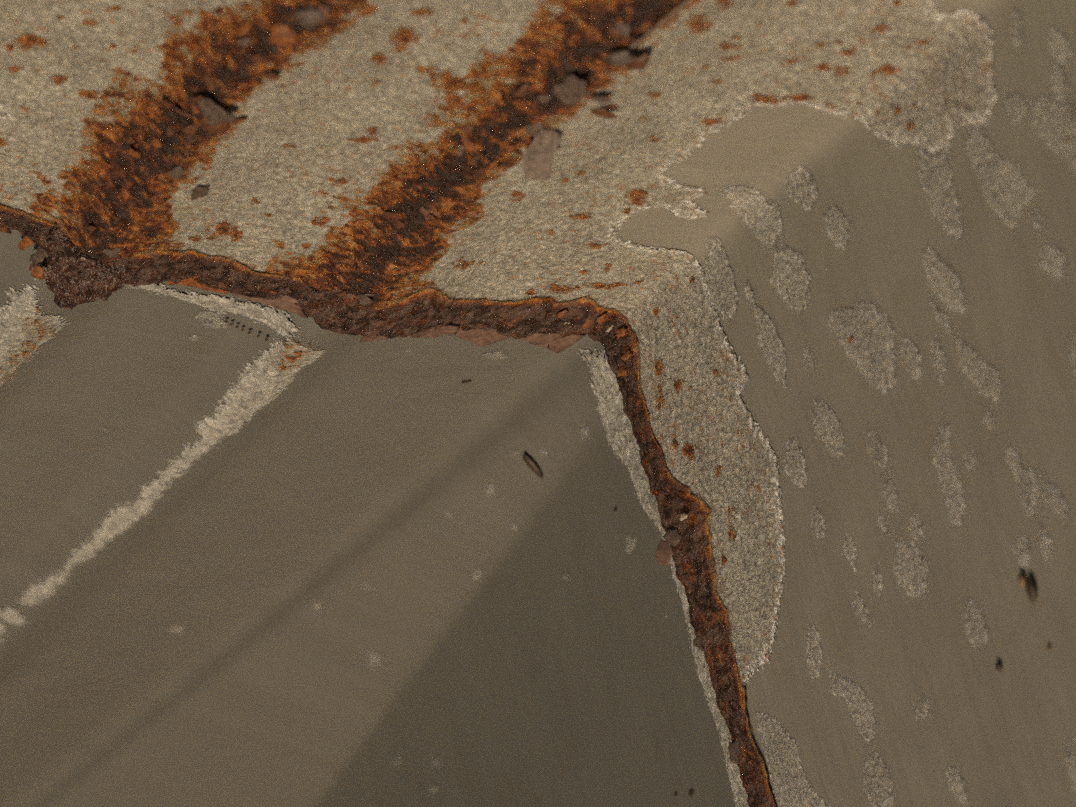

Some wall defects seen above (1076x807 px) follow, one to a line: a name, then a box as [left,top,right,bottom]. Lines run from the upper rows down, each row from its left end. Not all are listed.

peeling [0,0,270,235]
peeling [128,0,614,282]
corrosion [813,41,860,76]
corrosion [871,64,902,77]
corrosion [918,149,963,242]
damp [0,278,69,386]
damp [0,338,326,643]
corrosion [0,0,851,807]
peeling [384,0,996,687]
corrosion [877,477,929,598]
corrosion [805,622,895,807]